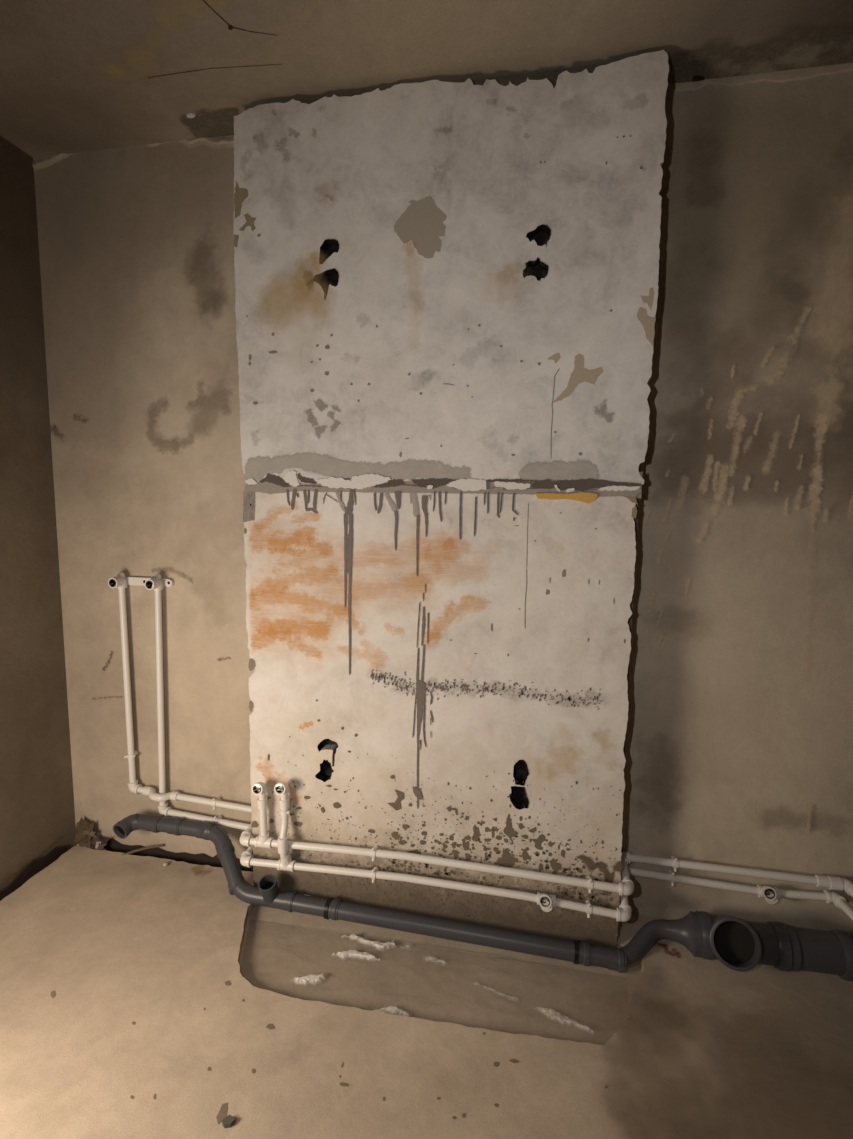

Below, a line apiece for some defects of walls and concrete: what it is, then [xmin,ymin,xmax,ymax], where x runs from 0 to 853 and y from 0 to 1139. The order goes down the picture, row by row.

peeling [394,196,447,259]
peeling [553,354,603,403]
leakage [697,207,853,542]
leakage [286,489,356,675]
leakage [370,491,602,809]
leakage [578,855,623,883]